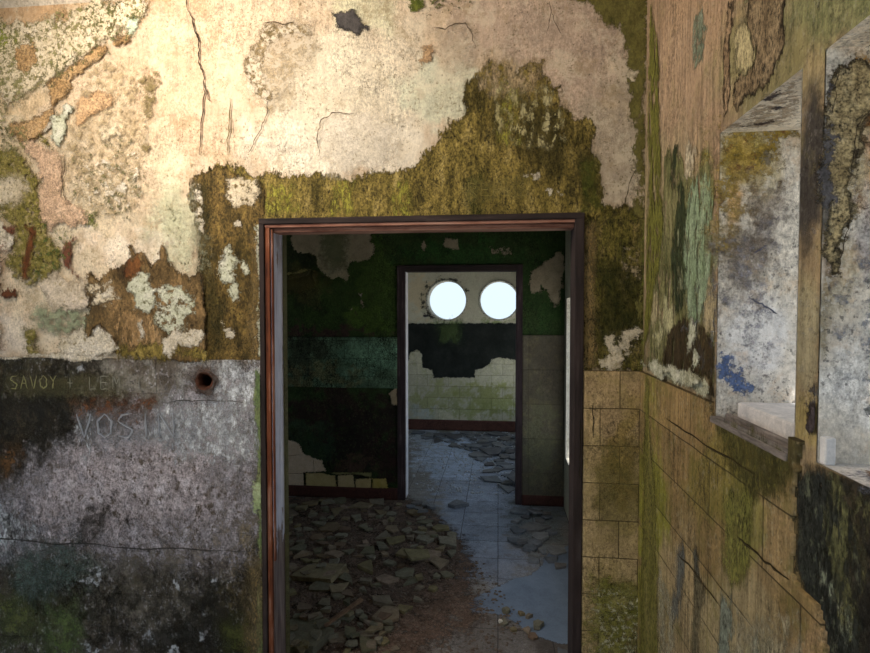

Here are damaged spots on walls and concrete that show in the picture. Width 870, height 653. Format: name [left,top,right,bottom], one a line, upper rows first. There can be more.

spalling [331,8,369,36]
crack [186,0,232,153]
peeling [0,244,209,363]
peeling [216,224,259,302]
peeling [408,275,516,379]
damp [0,238,263,653]
crack [666,418,756,476]
crack [0,538,251,552]
damp [657,541,706,653]
damp [717,419,792,586]
damp [717,594,799,653]
crack [738,537,789,580]